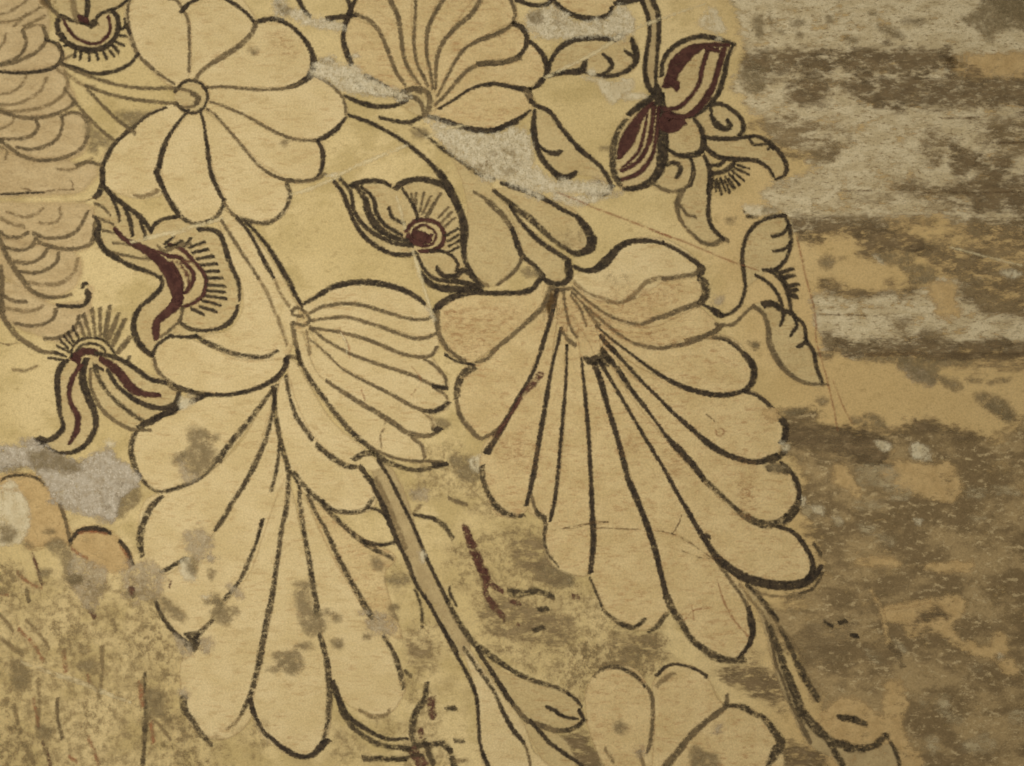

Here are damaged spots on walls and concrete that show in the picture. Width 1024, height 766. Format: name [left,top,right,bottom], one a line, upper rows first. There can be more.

flaking render [526,5,635,40]
peeling [730,0,1024,232]
flaking render [413,119,610,206]
peeling [808,277,1024,360]
damp [763,408,893,469]
flaking render [0,438,141,546]
damp [47,531,211,658]
flaking render [767,410,1024,766]
damp [0,629,198,764]
damp [720,664,787,705]
damp [563,733,601,766]
damp [782,742,828,766]